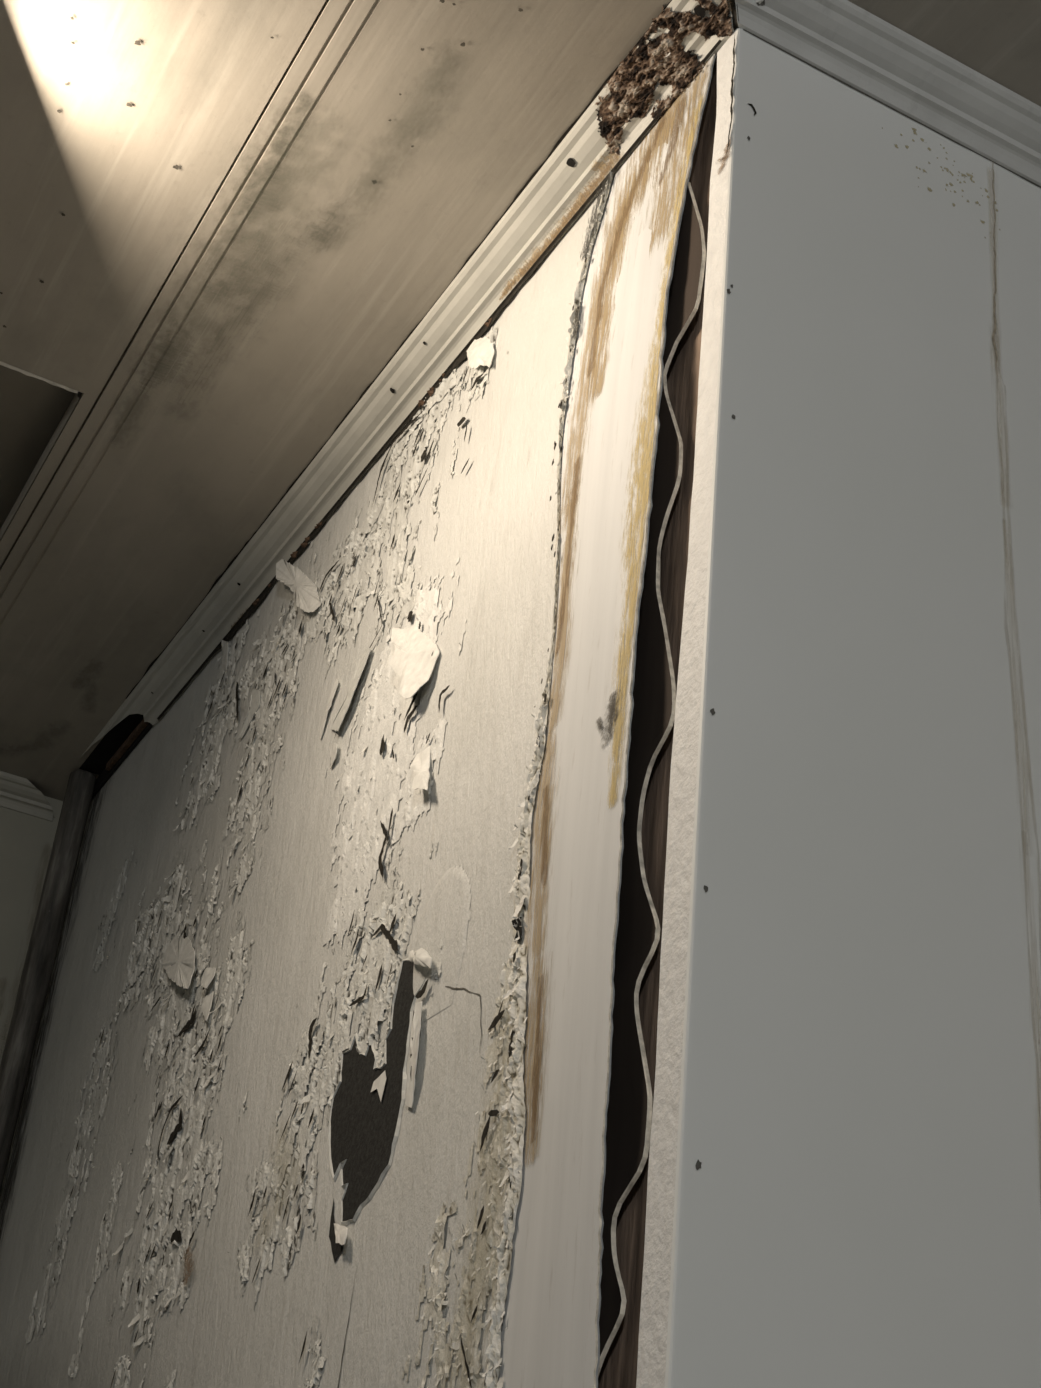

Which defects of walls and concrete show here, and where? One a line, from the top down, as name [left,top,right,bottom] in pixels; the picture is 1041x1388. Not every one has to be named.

peeling [25,324,515,1388]
water stain [524,66,708,1164]